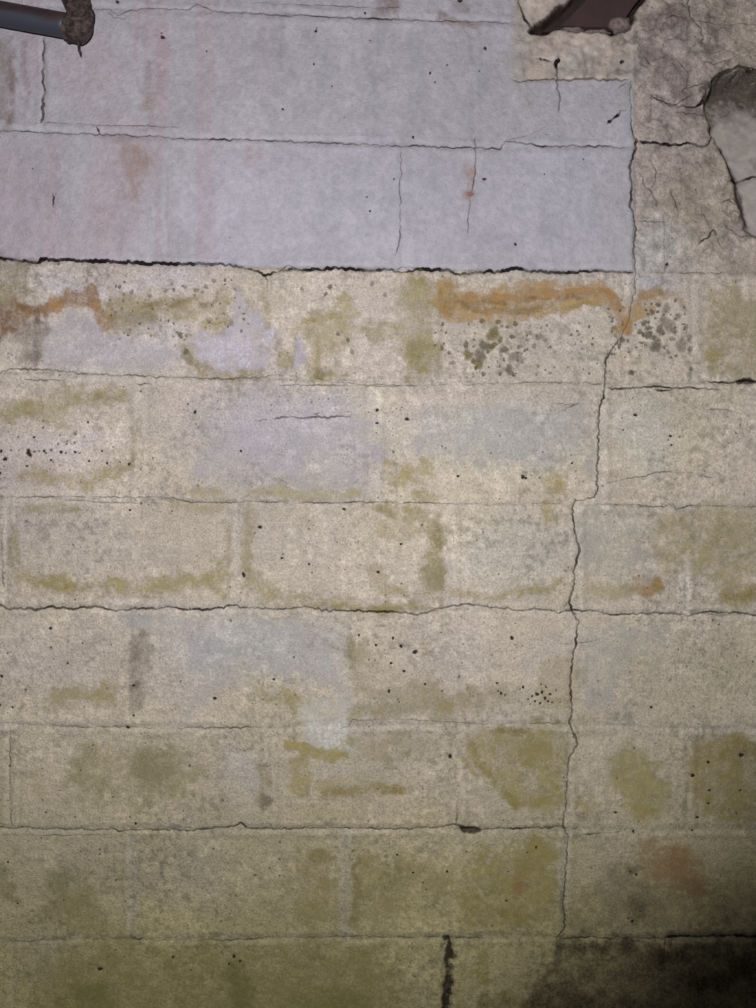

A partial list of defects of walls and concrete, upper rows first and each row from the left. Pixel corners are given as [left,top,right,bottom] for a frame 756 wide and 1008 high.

spalling [531,0,643,36]
spalling [702,65,756,237]
crack [587,114,711,274]
crack [0,236,599,277]
corrosion [0,284,113,330]
corrosion [432,279,662,334]
crack [559,342,756,738]
crack [0,603,244,611]
crack [319,606,395,614]
crack [666,932,756,940]